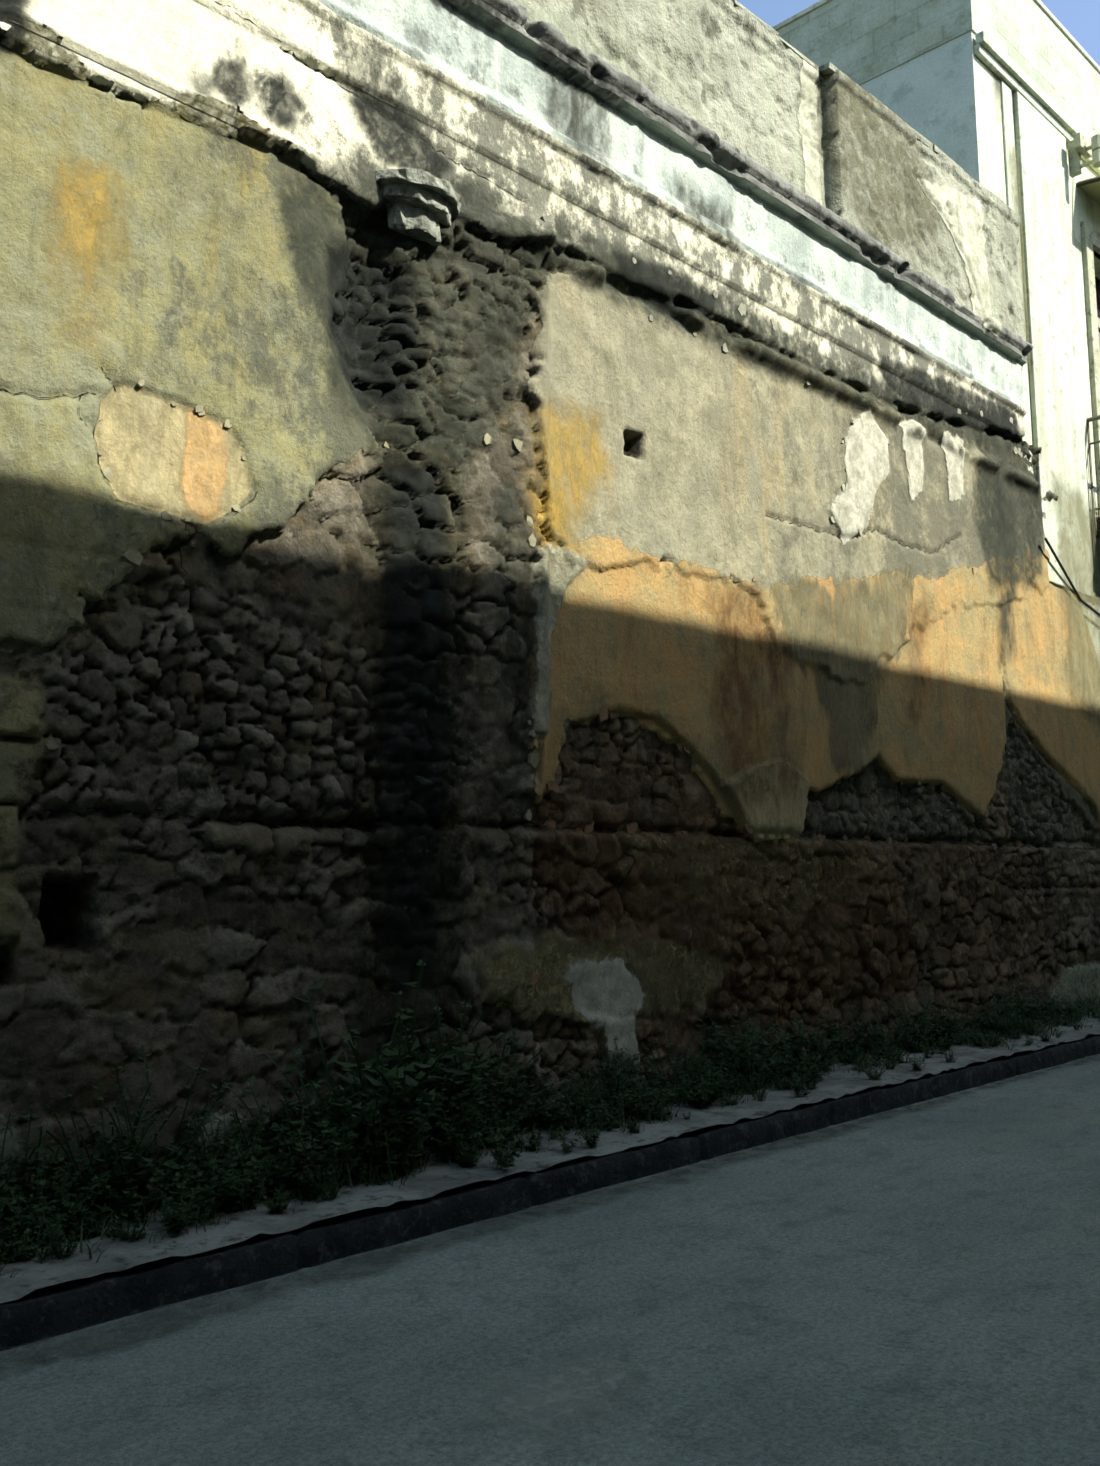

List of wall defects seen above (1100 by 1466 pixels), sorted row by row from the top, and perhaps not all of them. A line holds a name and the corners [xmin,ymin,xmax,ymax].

spalling [0,0,28,50]
leakage [196,59,305,127]
leakage [550,87,605,160]
leakage [820,72,940,246]
leakage [1020,247,1030,353]
peeling [94,379,253,524]
leakage [282,62,543,1093]
leakage [492,410,606,758]
crack [768,516,959,554]
peeling [829,410,965,545]
leakage [975,440,1100,714]
peeling [524,515,1100,850]